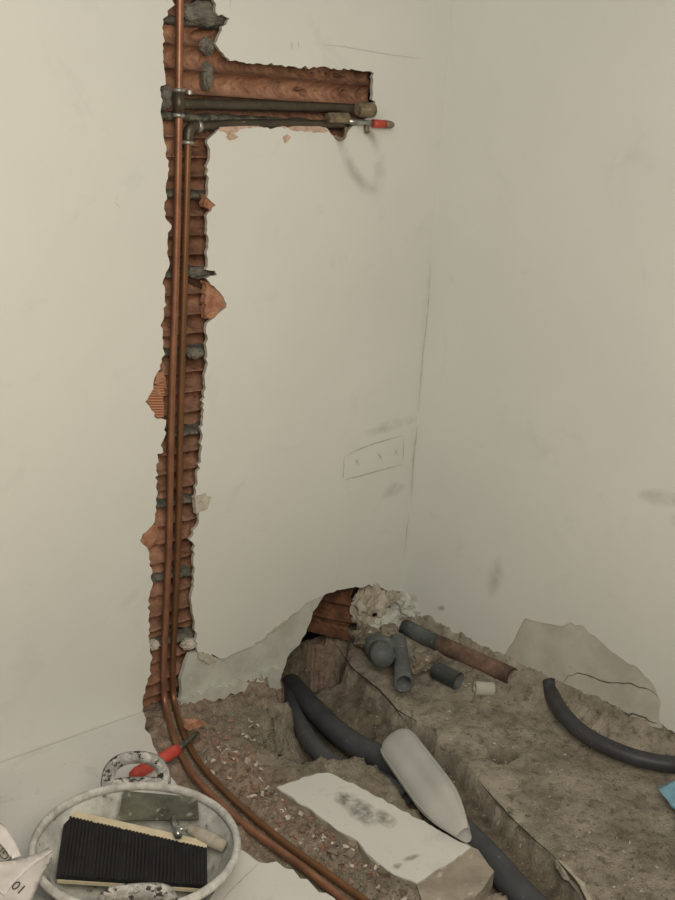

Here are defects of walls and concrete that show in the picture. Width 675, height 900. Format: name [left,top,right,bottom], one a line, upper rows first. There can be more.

spalling [219,126,260,140]
spalling [281,126,330,143]
spalling [199,194,214,211]
spalling [200,280,225,319]
spalling [146,369,166,418]
spalling [191,493,212,514]
spalling [140,523,158,548]
flaking render [177,583,421,706]
peeling [505,618,663,728]